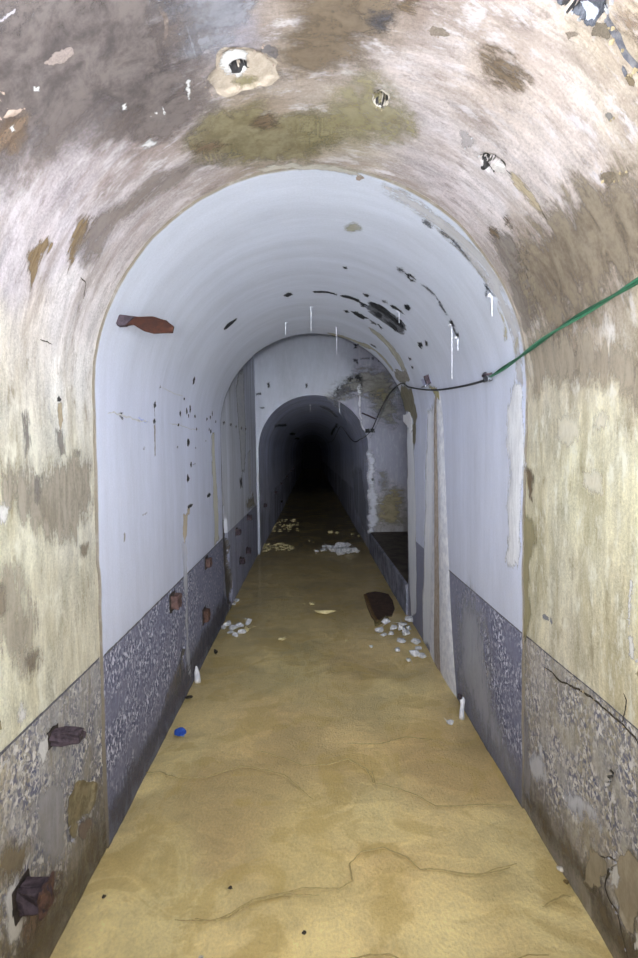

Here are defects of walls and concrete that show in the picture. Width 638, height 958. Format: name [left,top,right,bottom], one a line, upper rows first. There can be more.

spalling [557,0,614,40]
spalling [205,44,279,97]
spalling [0,91,27,154]
corrosion [116,315,174,334]
water stain [320,333,397,435]
water stain [354,410,433,647]
crack [544,667,638,743]
spalling [583,847,638,950]